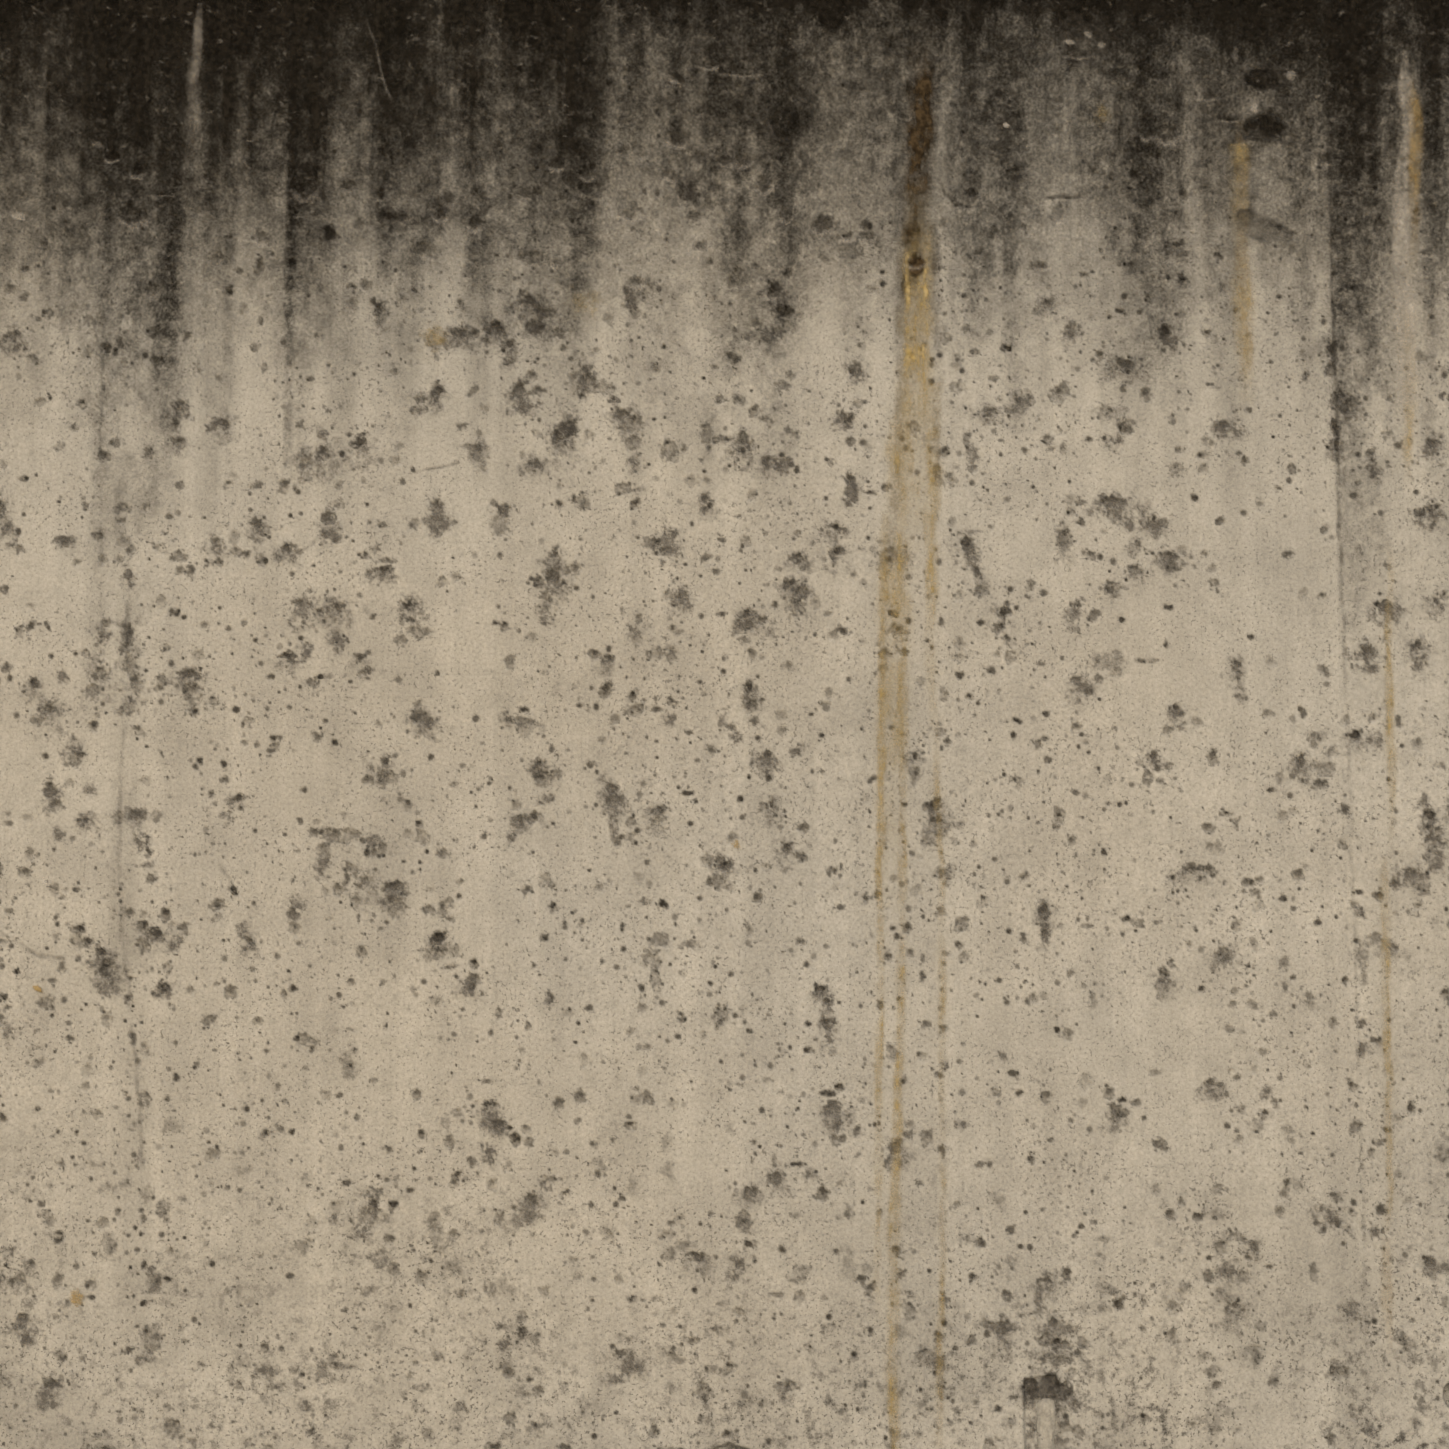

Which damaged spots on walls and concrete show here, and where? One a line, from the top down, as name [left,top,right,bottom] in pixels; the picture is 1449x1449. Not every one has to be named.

damp [0,0,1449,347]
rust [904,69,934,396]
spalling [588,763,693,839]
spalling [1352,869,1429,905]
spalling [879,924,926,1009]
spalling [820,1084,860,1139]
spalling [1106,1089,1163,1148]
spalling [745,1162,827,1195]